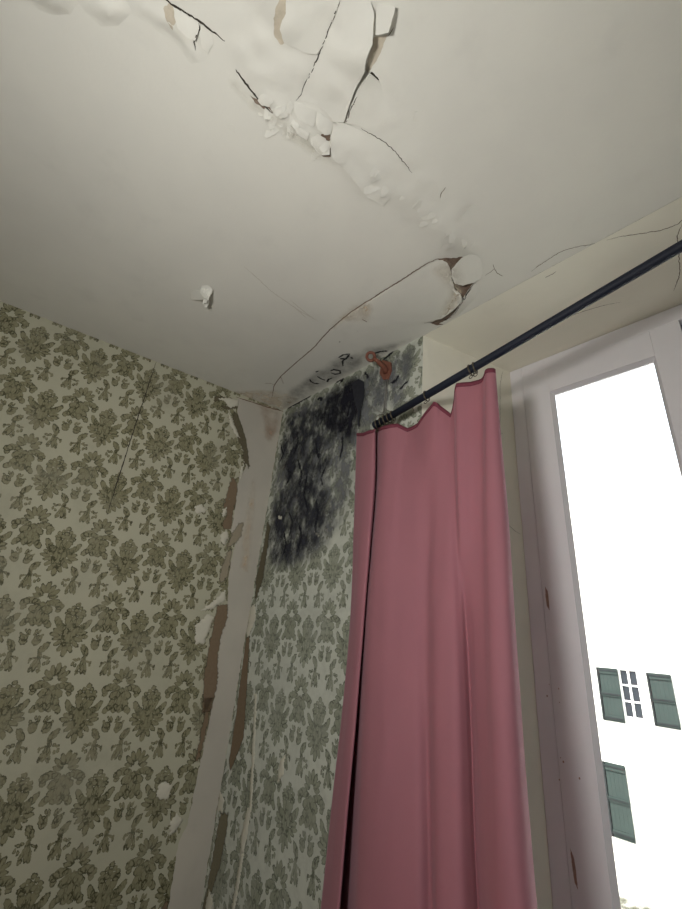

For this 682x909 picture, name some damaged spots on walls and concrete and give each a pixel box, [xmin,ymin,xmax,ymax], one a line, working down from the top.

peeling [163,0,214,53]
crack [166,0,224,48]
crack [236,70,273,114]
peeling [250,0,405,207]
peeling [190,285,212,308]
peeling [332,231,483,339]
crack [430,265,502,323]
crack [532,220,682,289]
crack [237,258,454,411]
leakage [270,350,408,563]
flaking render [159,396,283,909]
flaking render [156,781,172,800]